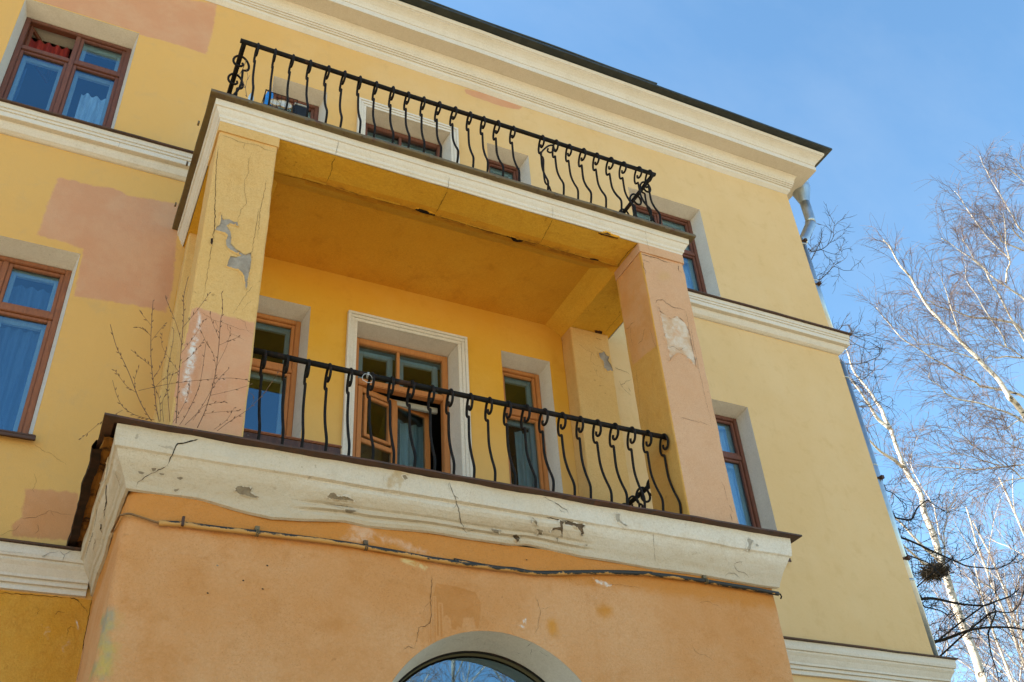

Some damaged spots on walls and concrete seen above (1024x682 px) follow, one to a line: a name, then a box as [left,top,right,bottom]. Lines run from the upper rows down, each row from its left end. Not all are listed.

peeling [215,212,253,290]
crack [201,136,679,335]
peeling [598,351,614,372]
peeling [656,305,698,369]
crack [4,439,198,559]
peeling [233,485,261,499]
peeling [325,491,359,514]
spalling [530,516,589,547]